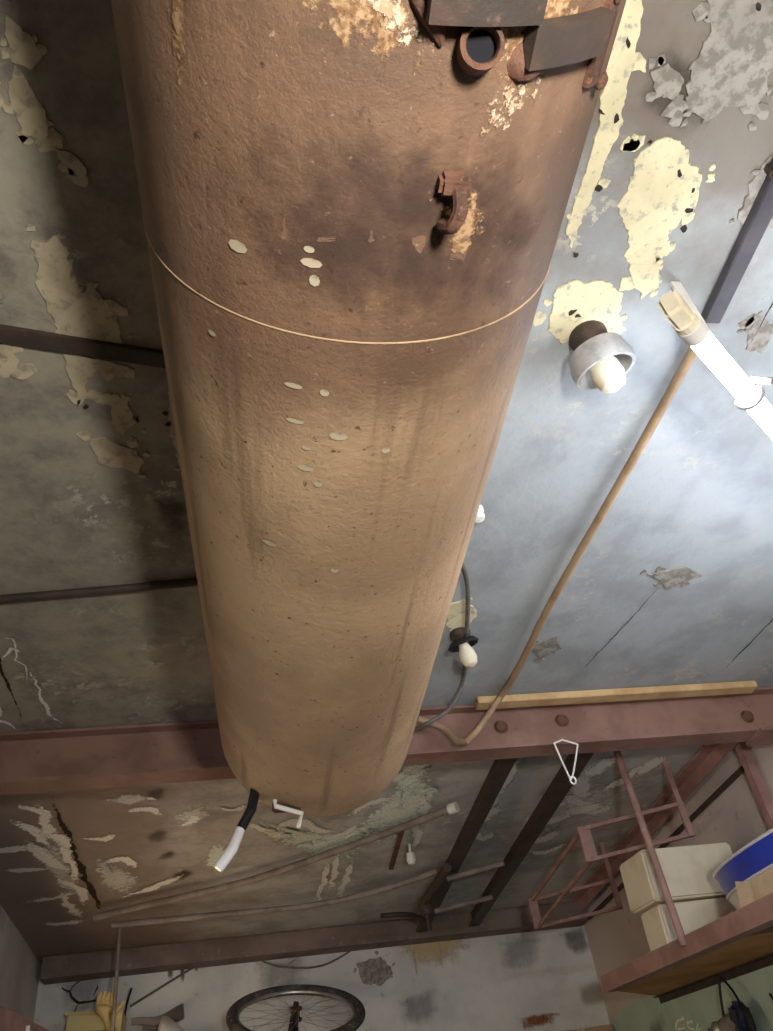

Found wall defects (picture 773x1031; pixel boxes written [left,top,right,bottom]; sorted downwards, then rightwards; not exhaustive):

peeling [0,15,89,188]
peeling [533,0,773,345]
peeling [26,224,133,344]
peeling [0,343,38,380]
peeling [63,353,150,478]
peeling [640,566,702,589]
crack [0,658,21,717]
crack [52,803,101,909]
peeling [353,951,395,986]